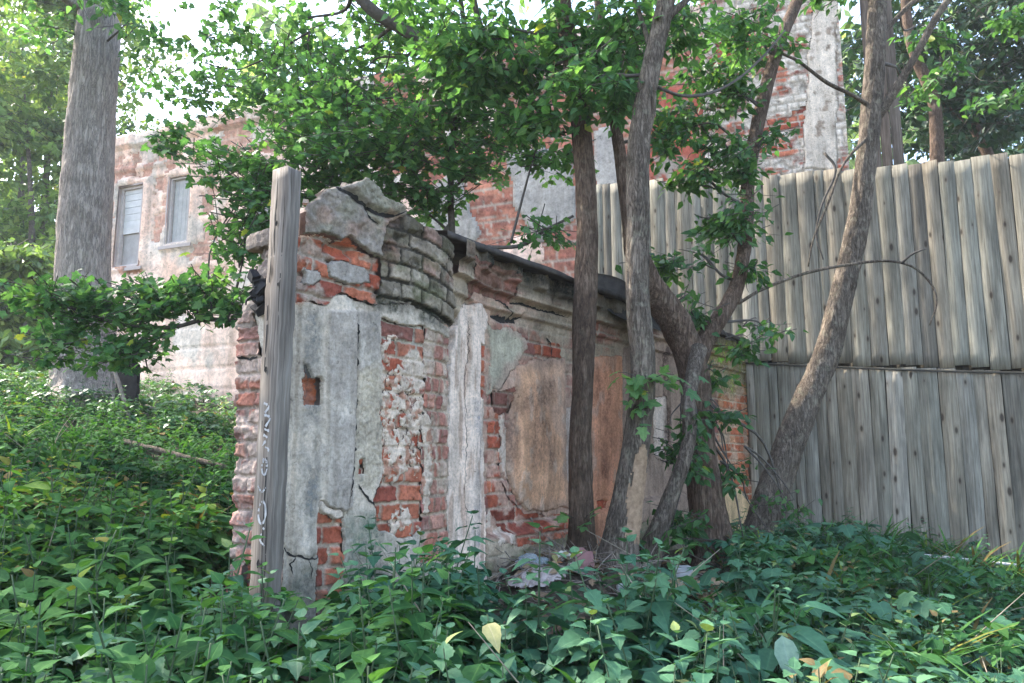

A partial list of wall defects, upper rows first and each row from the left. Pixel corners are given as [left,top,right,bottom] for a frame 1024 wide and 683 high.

crack [325,184,406,224]
spalling [296,234,381,305]
flaking render [534,342,561,359]
spalling [301,372,316,405]
crack [347,315,383,512]
flaking render [373,318,449,563]
flaking render [480,346,569,547]
crack [283,548,318,578]
flaking render [315,501,345,616]